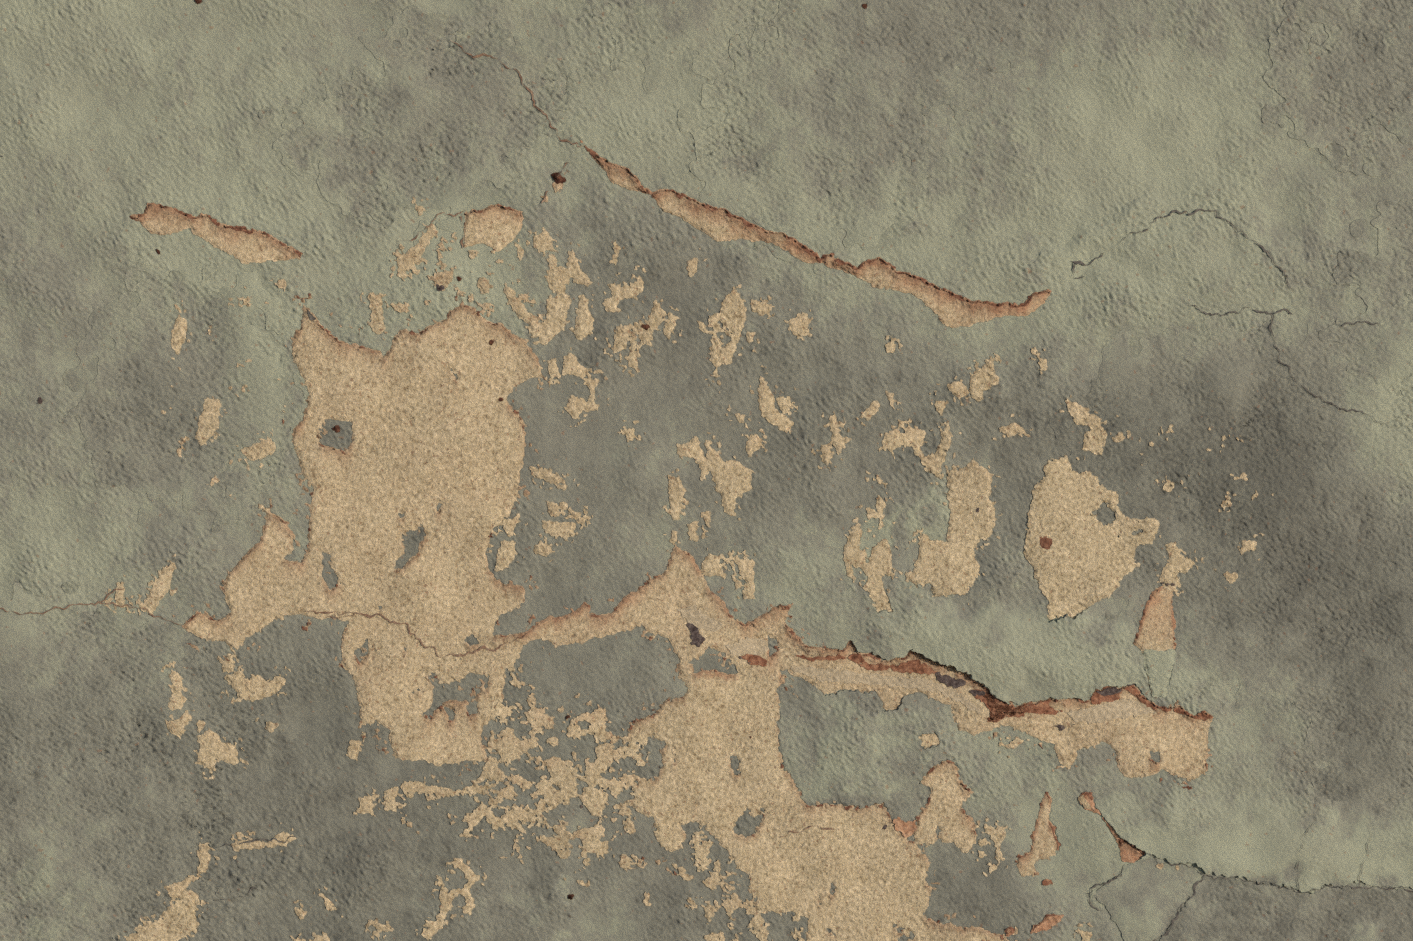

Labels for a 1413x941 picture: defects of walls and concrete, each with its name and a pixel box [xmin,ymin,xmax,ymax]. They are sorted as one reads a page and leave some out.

crack [450,38,584,203]
spalling [129,203,303,264]
spalling [580,140,1052,328]
crack [1072,209,1390,427]
peeling [104,554,177,615]
flaking render [161,197,1238,941]
peeling [1219,473,1274,512]
peeling [1237,533,1264,560]
peeling [117,823,303,941]
crack [1087,819,1413,941]